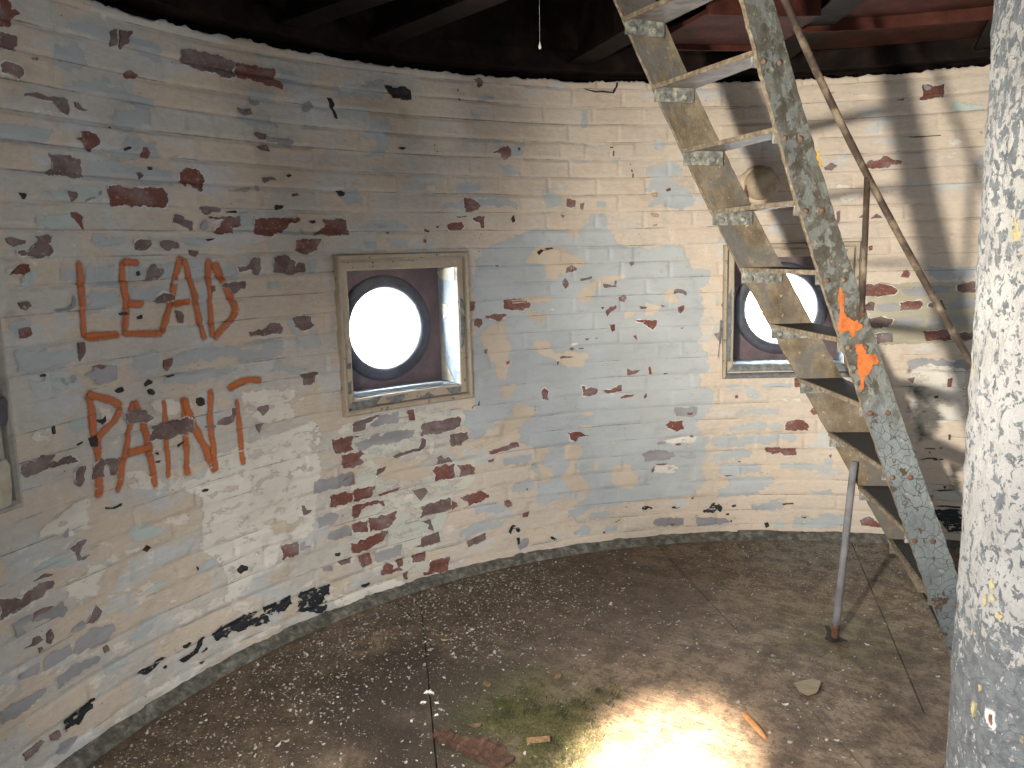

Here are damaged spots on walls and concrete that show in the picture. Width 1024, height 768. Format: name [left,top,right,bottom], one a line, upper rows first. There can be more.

spalling [0,0,38,81]
spalling [180,48,283,90]
spalling [385,85,412,101]
spalling [919,83,984,112]
spalling [0,123,350,324]
peeling [866,266,976,346]
peeling [329,188,844,580]
spalling [0,415,121,509]
spalling [124,397,237,463]
spalling [0,573,55,622]
peeling [263,596,292,615]
peeling [984,708,997,730]